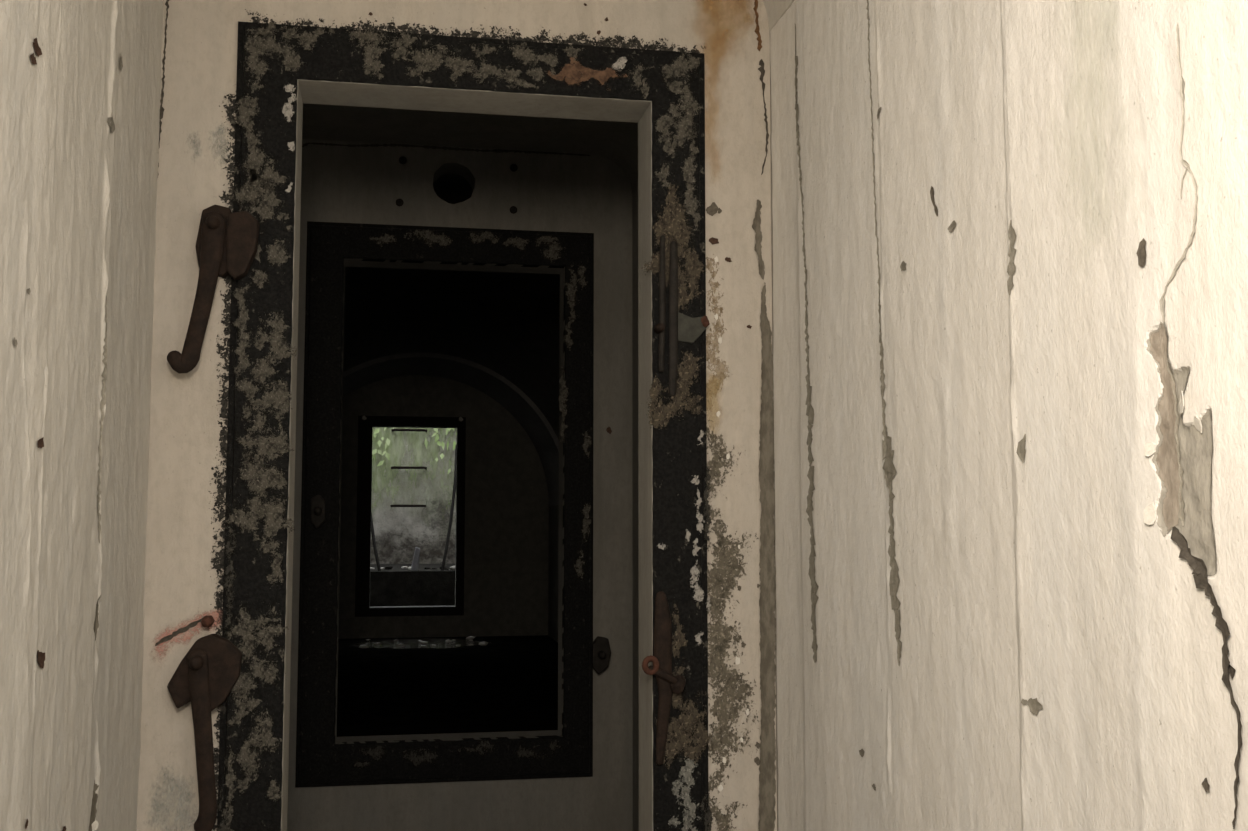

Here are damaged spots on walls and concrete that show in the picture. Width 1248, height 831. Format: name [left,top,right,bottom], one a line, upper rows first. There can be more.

peeling [216,21,330,831]
peeling [346,12,776,831]
crack [753,0,819,663]
crack [866,0,902,666]
crack [1160,23,1198,323]
spalling [1143,322,1216,576]
crack [1171,526,1242,829]